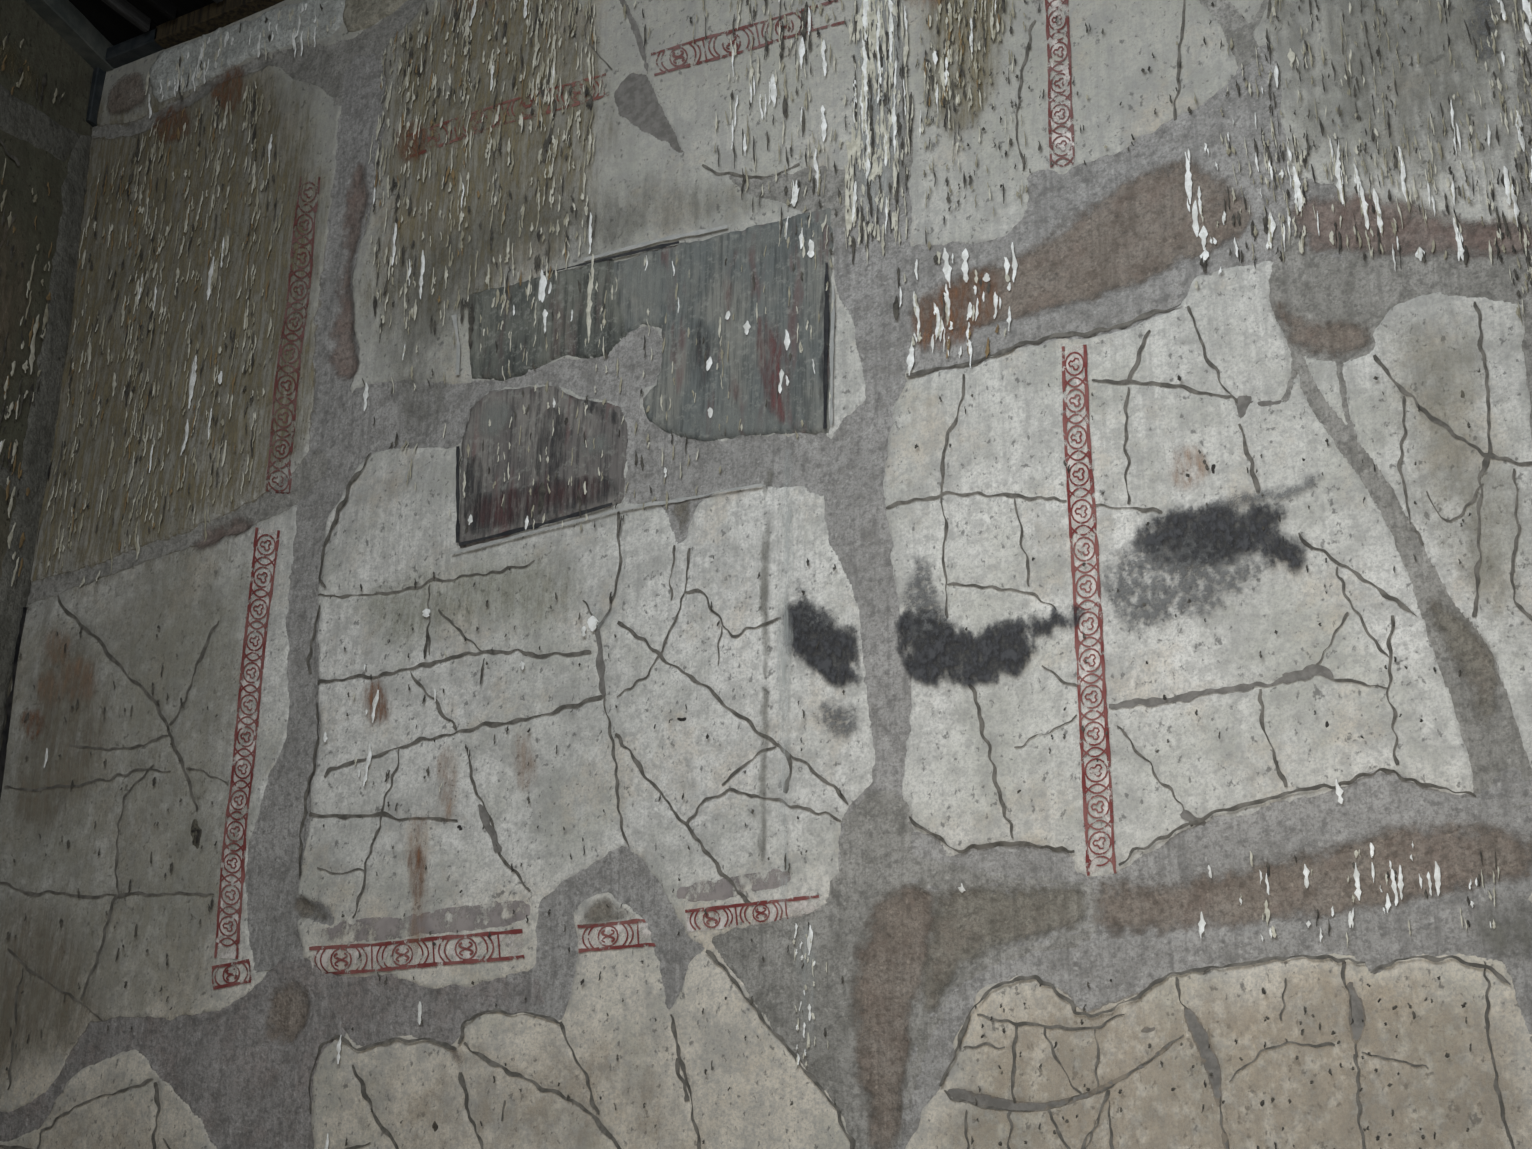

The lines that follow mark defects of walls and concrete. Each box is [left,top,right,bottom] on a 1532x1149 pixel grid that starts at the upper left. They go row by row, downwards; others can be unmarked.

damp [0,3,336,587]
damp [366,0,643,533]
damp [687,258,766,435]
crack [886,304,1260,617]
damp [1185,0,1532,326]
crack [298,452,848,918]
crack [909,532,1476,866]
flaking render [1432,604,1497,721]
flaking render [296,896,325,918]
flaking render [586,900,623,923]
crack [939,954,1515,1149]
flaking render [923,823,1532,1010]